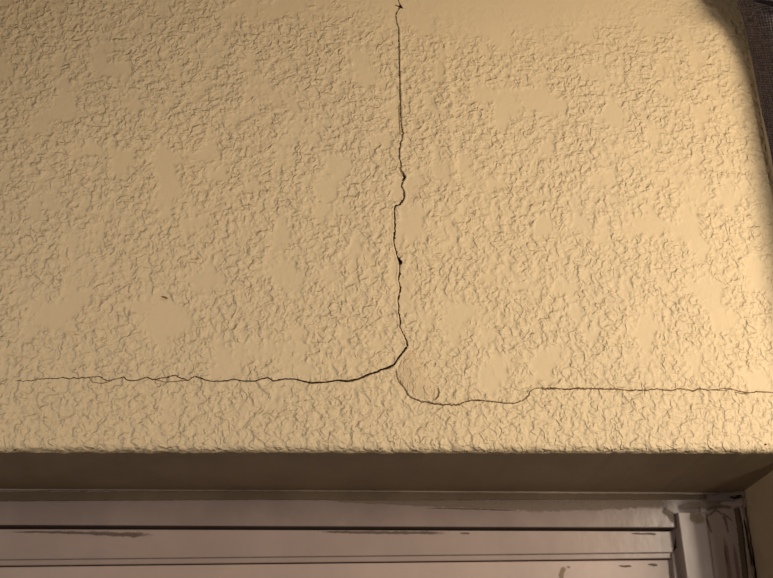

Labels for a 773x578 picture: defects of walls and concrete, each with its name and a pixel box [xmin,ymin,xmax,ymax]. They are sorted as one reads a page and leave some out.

crack [17,0,773,406]